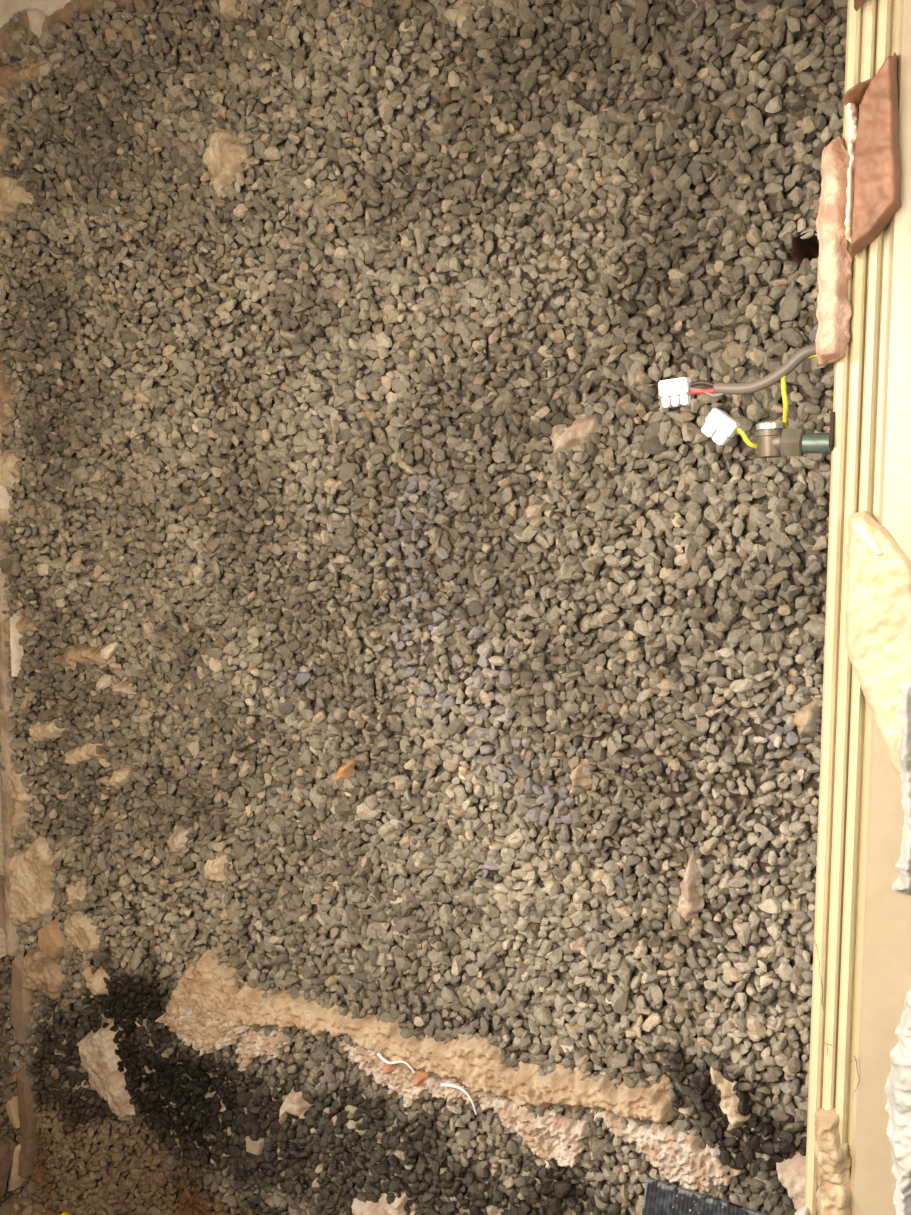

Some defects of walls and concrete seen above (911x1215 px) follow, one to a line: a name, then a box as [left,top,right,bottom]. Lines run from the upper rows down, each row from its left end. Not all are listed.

peeling [27,10,46,38]
peeling [0,485,12,510]
peeling [9,614,24,677]
flaking render [37,919,67,959]
flaking render [10,957,34,1045]
peeling [155,1000,290,1072]
flaking render [0,1065,40,1197]
flaking render [245,1136,265,1155]
leakage [30,963,622,1215]
peeling [338,1036,741,1194]
leakage [669,1052,807,1175]
flaking render [794,1107,852,1215]